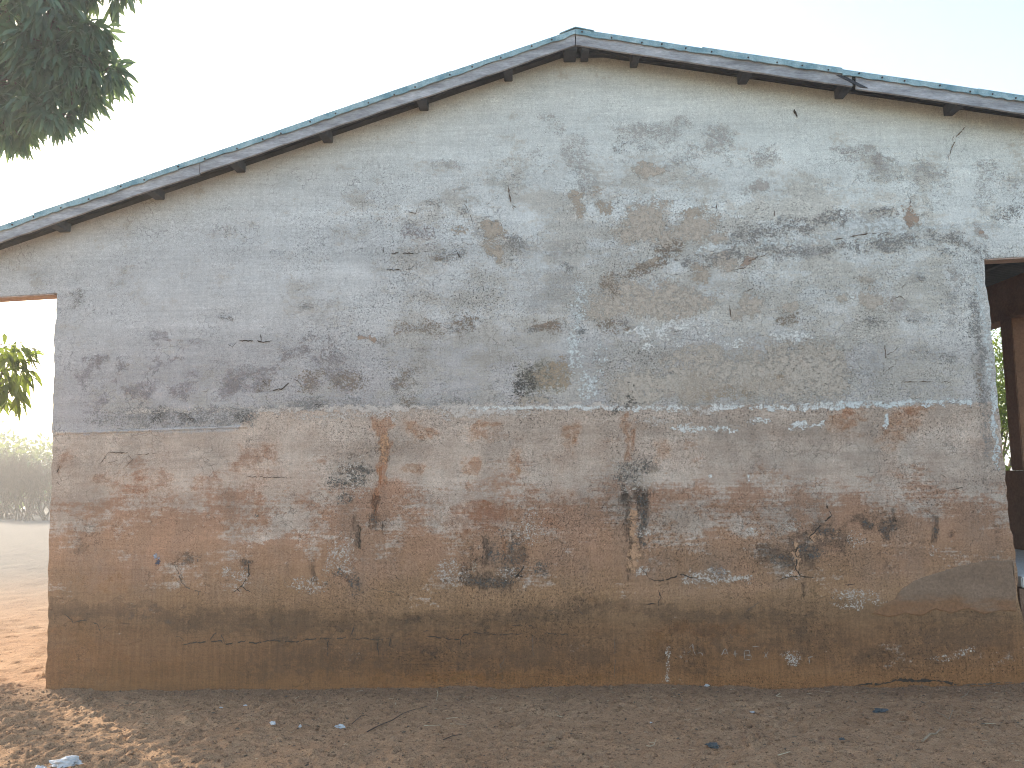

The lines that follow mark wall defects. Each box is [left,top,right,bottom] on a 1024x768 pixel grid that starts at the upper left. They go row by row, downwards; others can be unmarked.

peeling [401,113,1023,459]
leakage [512,354,572,407]
leakage [434,507,552,588]
crack [778,504,832,581]
crack [640,567,694,610]
leakage [831,589,887,611]
crack [176,625,391,656]